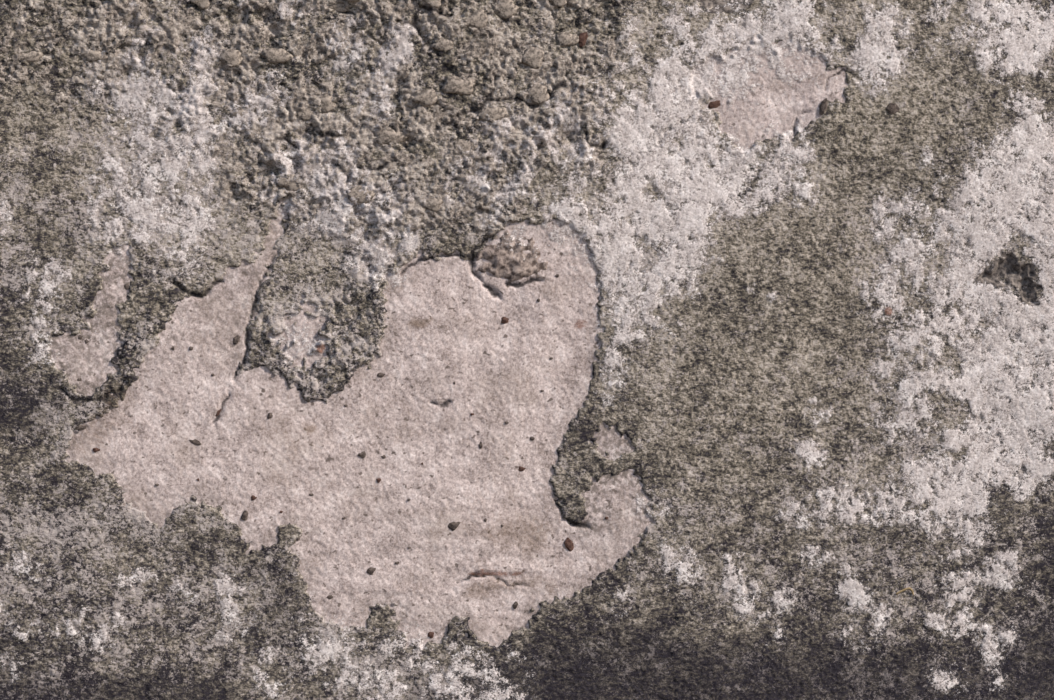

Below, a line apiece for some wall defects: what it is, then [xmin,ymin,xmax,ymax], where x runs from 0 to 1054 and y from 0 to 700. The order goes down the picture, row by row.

leakage [265,288,345,379]
spalling [0,0,653,648]
leakage [433,0,1054,691]
leakage [926,662,971,699]